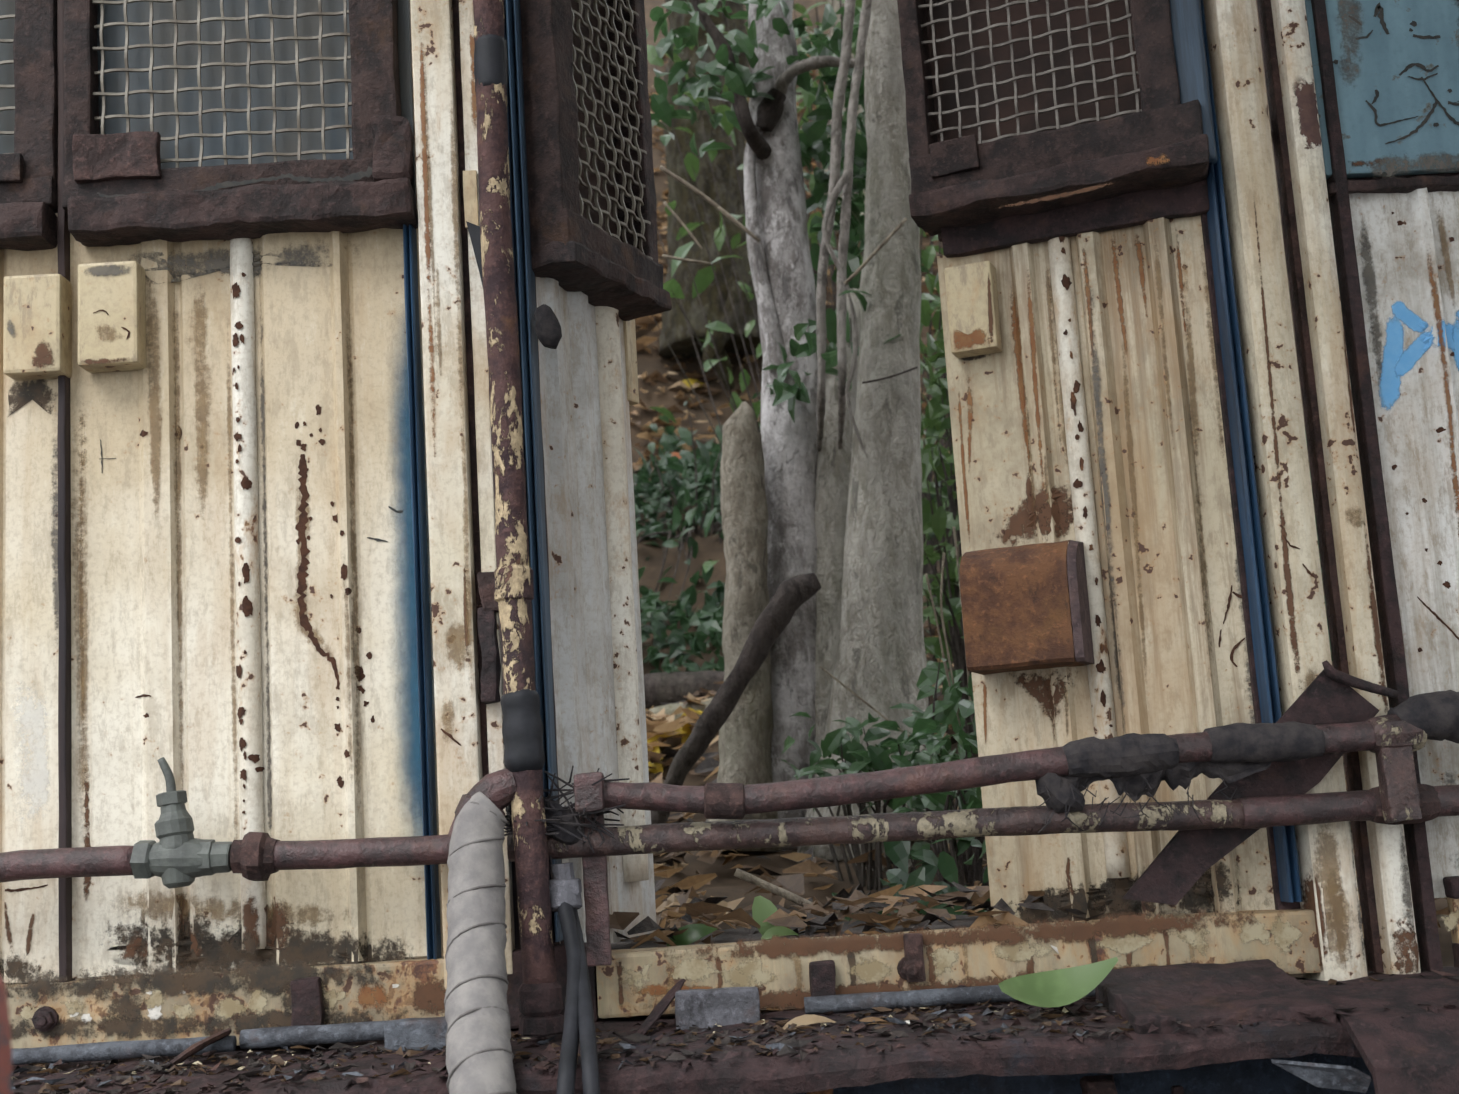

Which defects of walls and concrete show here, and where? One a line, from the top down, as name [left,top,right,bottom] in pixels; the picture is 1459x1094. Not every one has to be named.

corrosion [954,276,993,361]
corrosion [997,270,1074,546]
damp [51,445,59,628]
corrosion [73,461,90,847]
corrosion [330,564,375,758]
corrosion [1013,671,1073,736]
corrosion [128,894,331,956]
peeling [671,957,775,987]
peeling [931,948,959,977]
peeling [994,939,1049,962]
peeling [1096,933,1153,954]
peeling [1441,910,1459,931]